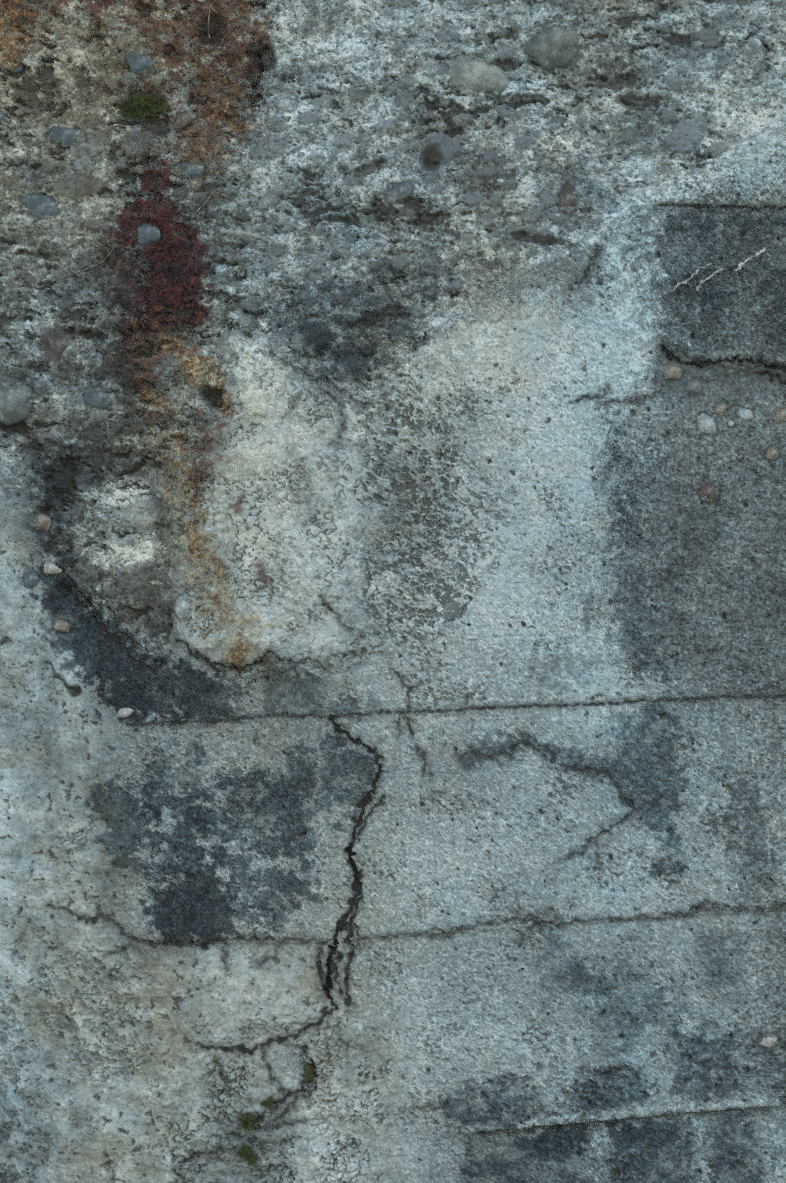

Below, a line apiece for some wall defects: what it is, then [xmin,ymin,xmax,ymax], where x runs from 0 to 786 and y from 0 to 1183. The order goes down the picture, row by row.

corrosion [0,0,270,670]
crack [661,345,786,384]
water stain [29,447,249,727]
water stain [445,118,786,904]
water stain [90,734,380,950]
crack [47,673,786,1183]
water stain [441,932,786,1183]